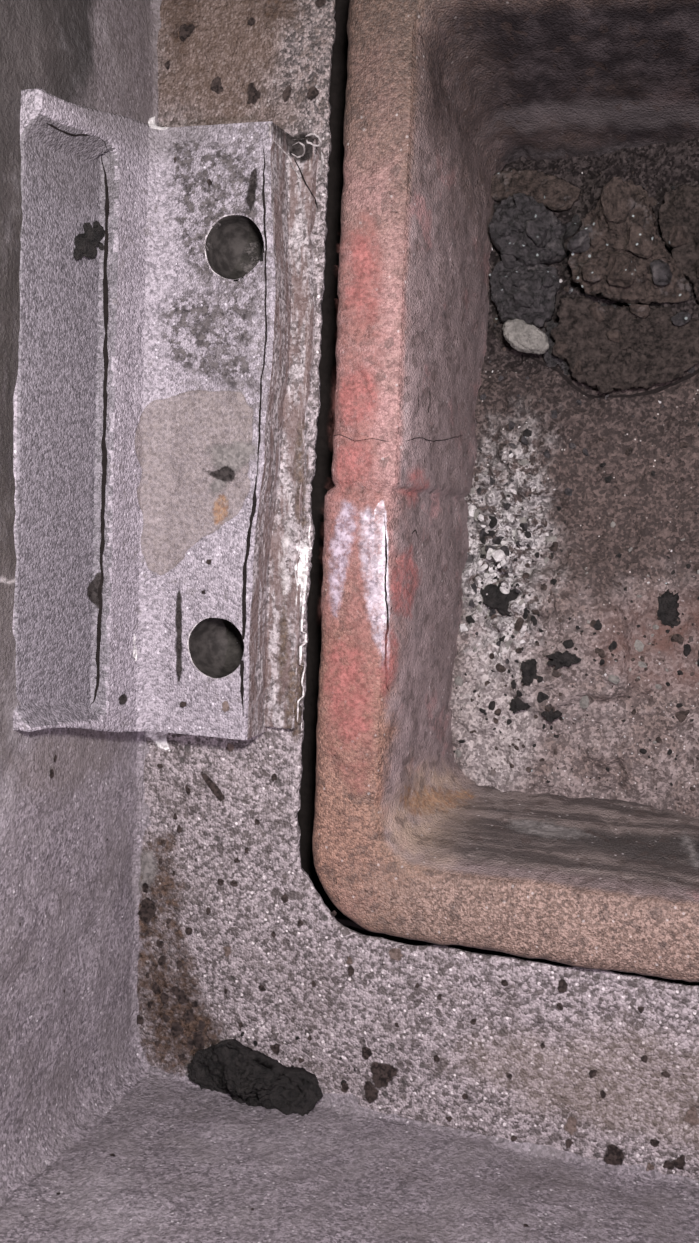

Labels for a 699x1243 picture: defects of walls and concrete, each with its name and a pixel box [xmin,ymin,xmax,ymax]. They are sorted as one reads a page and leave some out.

crack [331,397,462,442]
crack [384,520,418,692]